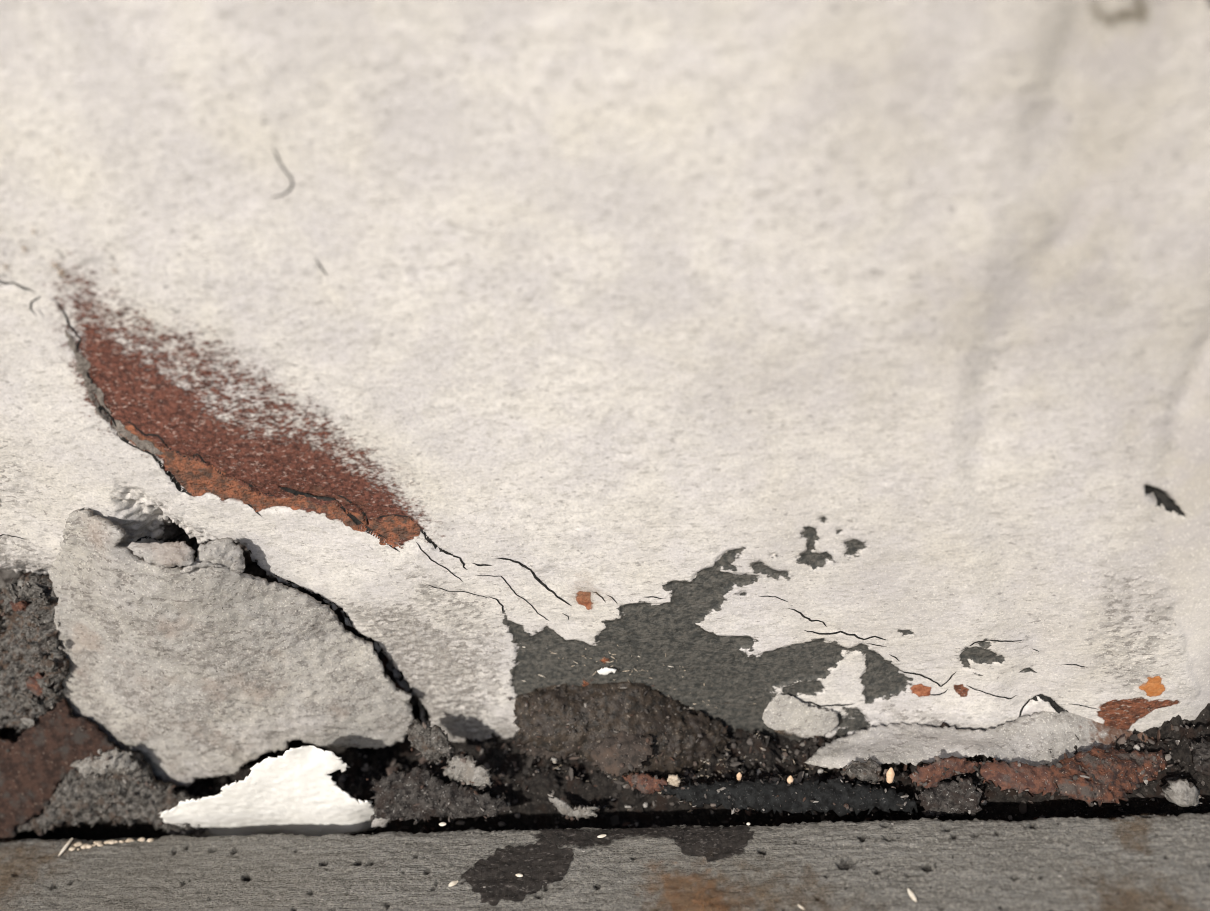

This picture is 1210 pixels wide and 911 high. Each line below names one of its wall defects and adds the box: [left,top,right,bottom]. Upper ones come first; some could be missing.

rust [49,263,428,549]
crack [0,281,663,621]
spalling [1145,485,1187,518]
crack [249,550,430,723]
peeling [502,517,913,741]
peeling [957,639,1005,676]
rust [911,684,931,697]
rust [954,684,969,697]
rust [1097,676,1179,730]
rust [909,756,1058,817]